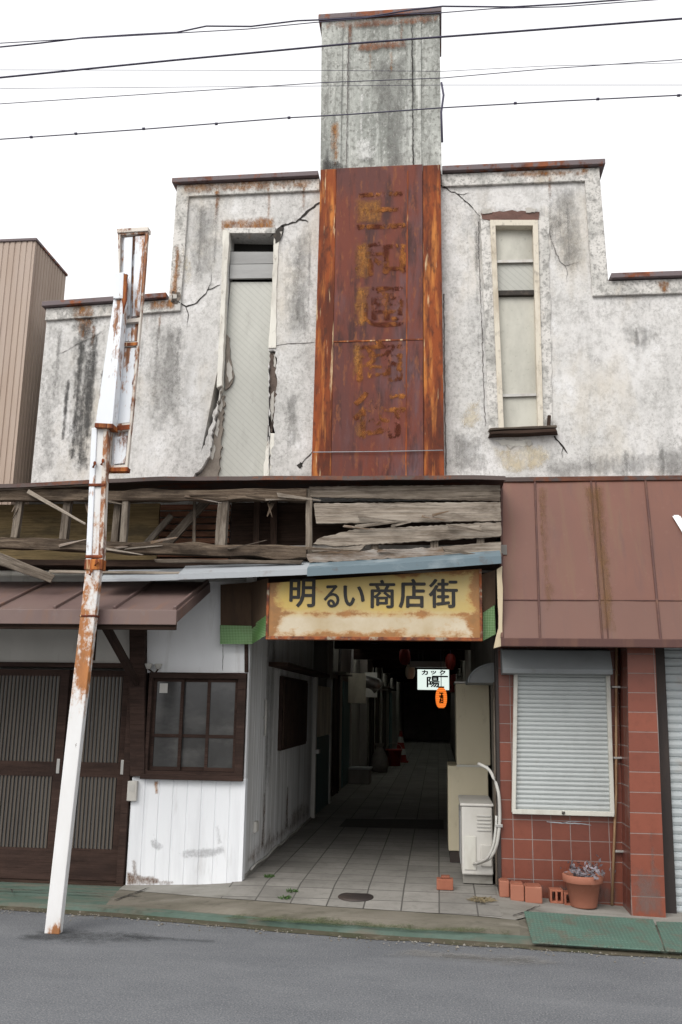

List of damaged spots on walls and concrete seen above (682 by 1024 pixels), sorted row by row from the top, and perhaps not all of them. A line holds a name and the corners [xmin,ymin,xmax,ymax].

corrosion [326,16,436,50]
corrosion [222,209,273,229]
crack [269,202,320,242]
crack [176,273,219,322]
corrosion [76,306,95,341]
water stain [62,317,103,465]
flaking render [197,334,235,477]
flaking render [268,353,277,433]